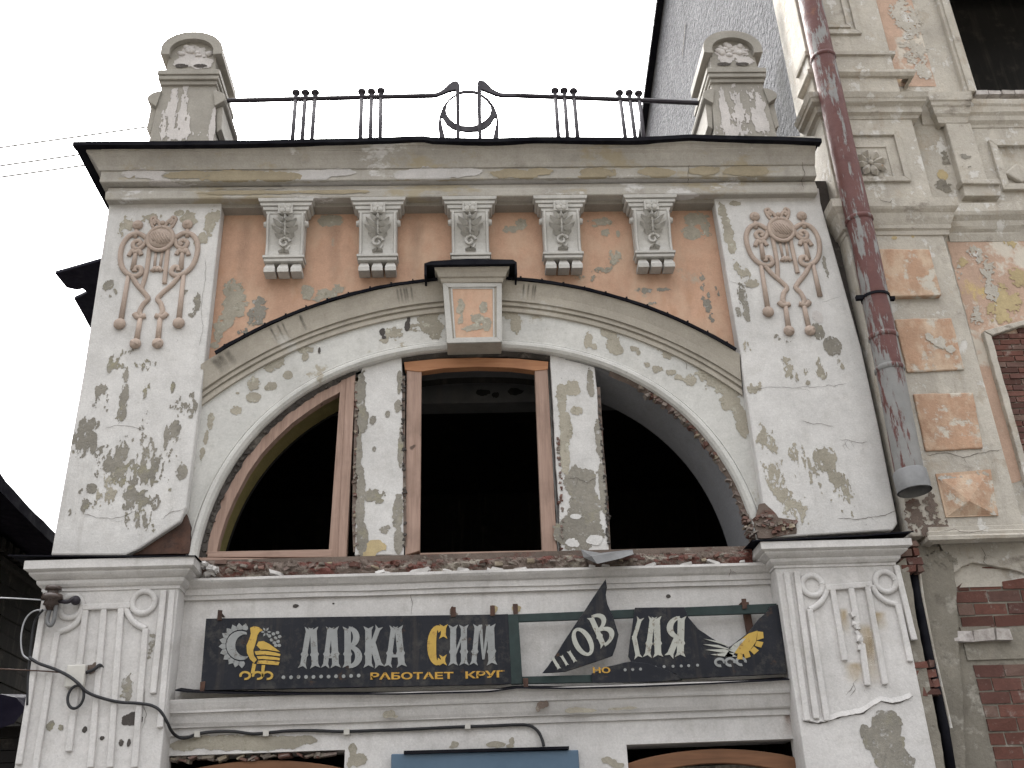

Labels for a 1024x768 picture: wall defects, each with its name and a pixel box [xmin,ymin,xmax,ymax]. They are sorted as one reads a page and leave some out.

peeling [159,86,216,141]
peeling [716,83,770,136]
peeling [210,278,269,349]
peeling [957,245,1024,325]
peeling [68,349,215,532]
flaking render [199,314,855,578]
spalling [802,492,958,768]